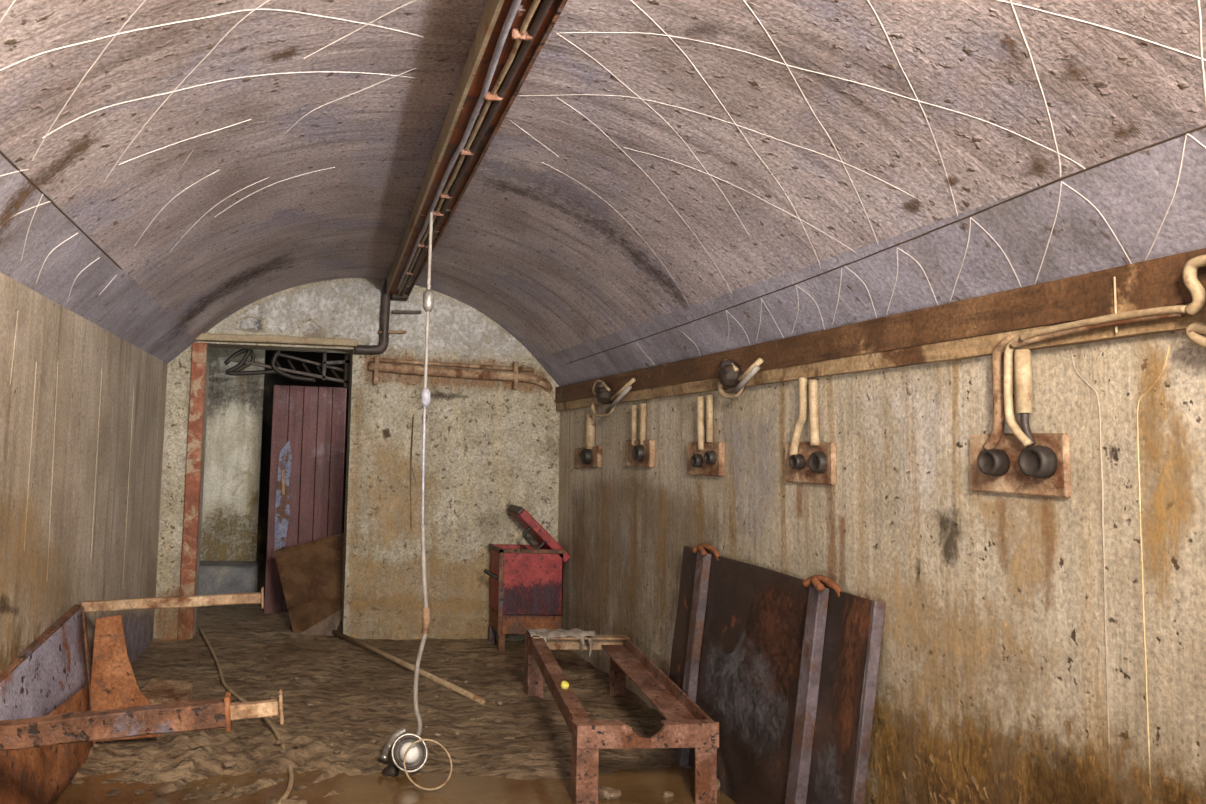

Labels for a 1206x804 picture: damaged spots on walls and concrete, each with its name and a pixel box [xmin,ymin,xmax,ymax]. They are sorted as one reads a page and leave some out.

water stain [864,686,1206,804]